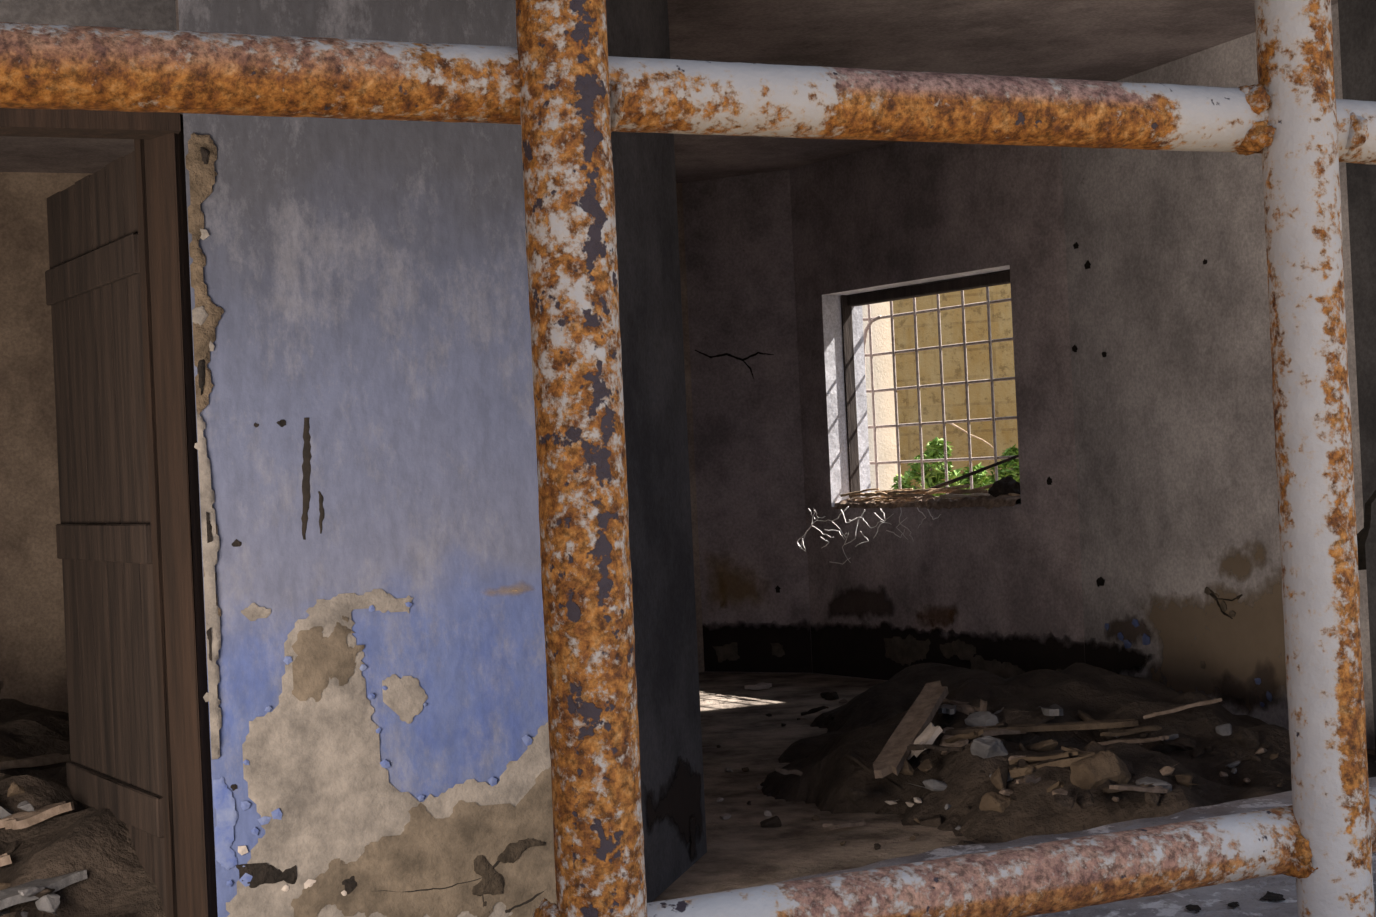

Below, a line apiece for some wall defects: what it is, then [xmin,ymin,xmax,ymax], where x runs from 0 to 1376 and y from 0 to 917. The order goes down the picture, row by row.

flaking render [185,133,242,760]
crack [695,350,774,379]
peeling [213,589,557,917]
damp [702,588,1151,680]